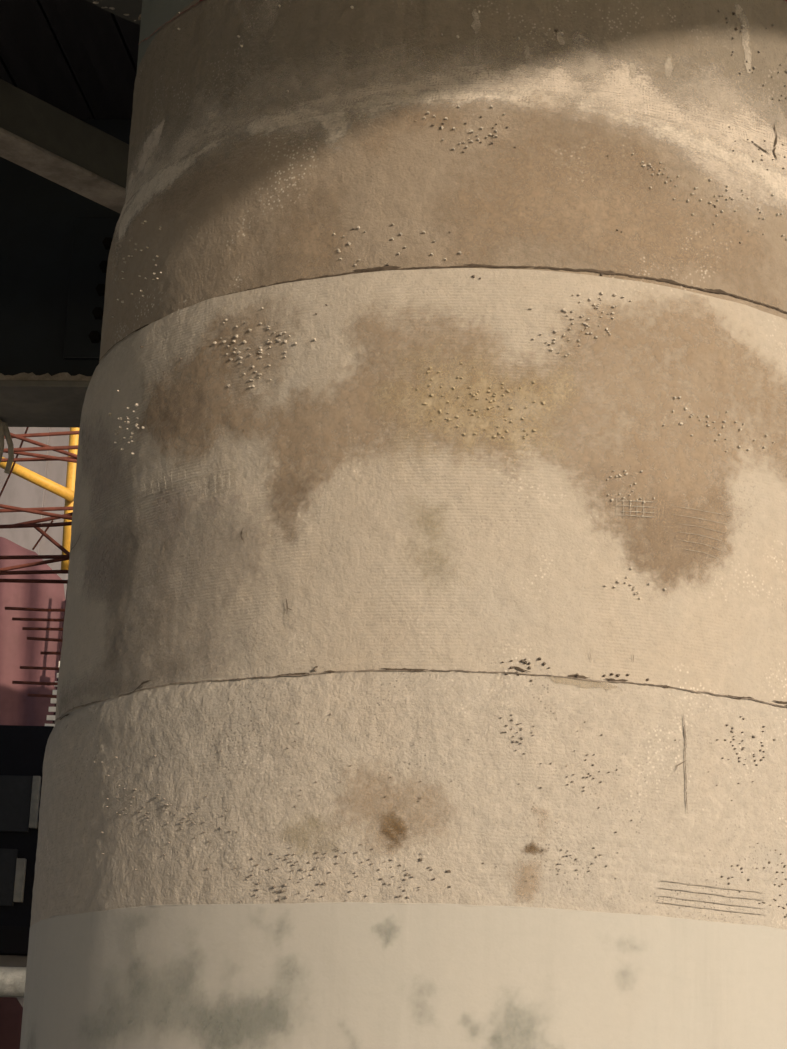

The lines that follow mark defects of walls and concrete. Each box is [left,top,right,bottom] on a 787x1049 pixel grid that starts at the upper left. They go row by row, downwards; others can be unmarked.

leakage [734,4,751,73]
leakage [135,118,165,179]
leakage [458,137,760,272]
leakage [142,308,787,582]